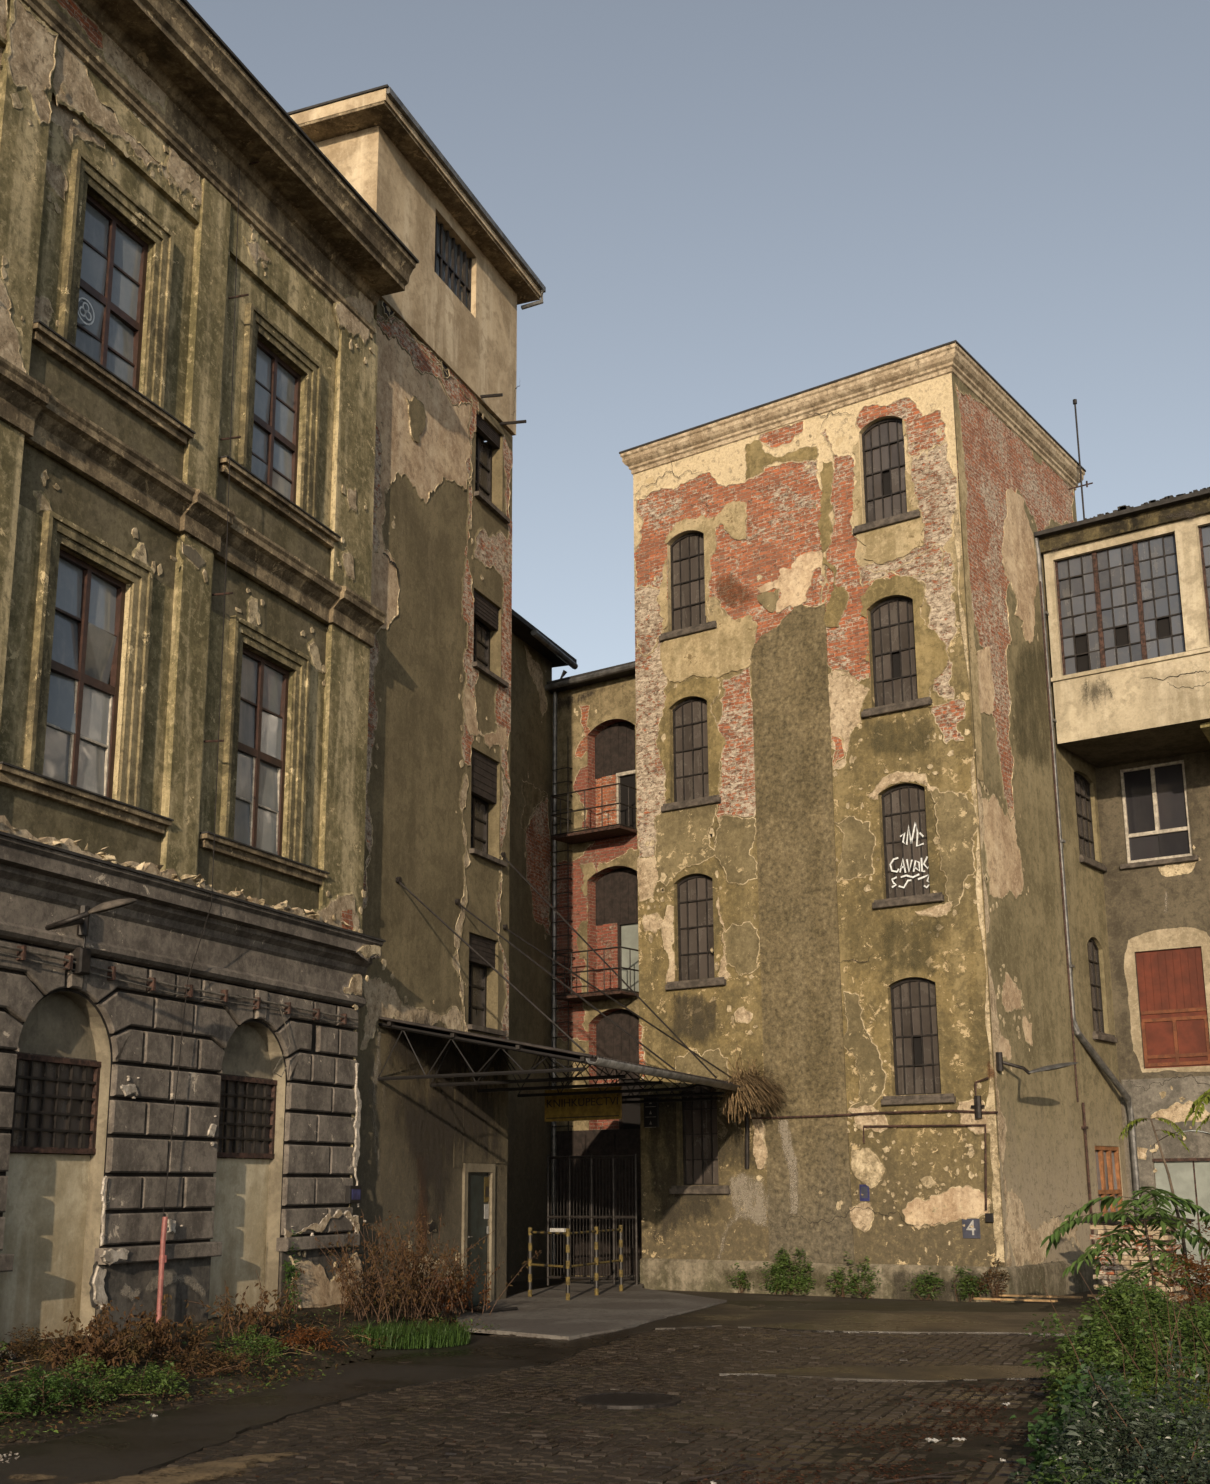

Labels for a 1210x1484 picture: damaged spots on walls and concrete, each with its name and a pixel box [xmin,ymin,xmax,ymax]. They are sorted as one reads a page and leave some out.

peeling [0,282,548,1322]
flaking render [524,381,1085,1267]